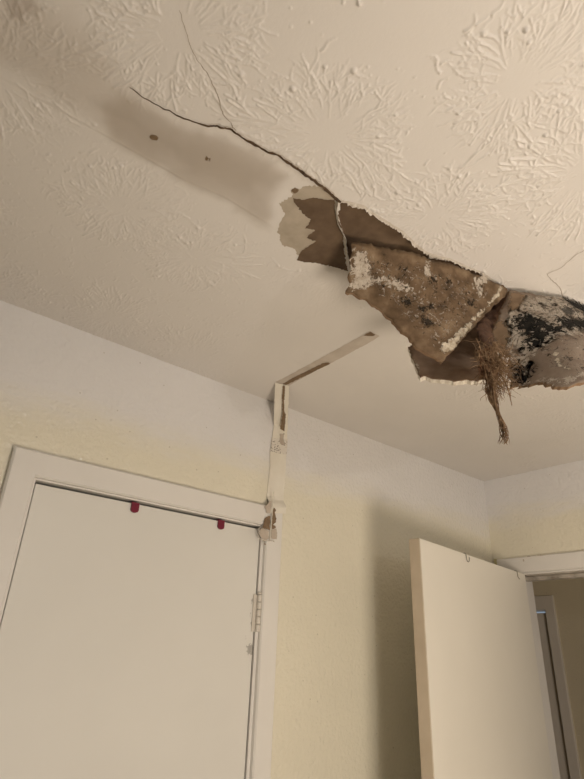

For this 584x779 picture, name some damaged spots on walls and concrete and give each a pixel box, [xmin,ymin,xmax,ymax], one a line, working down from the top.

crack [131,10,342,203]
peeling [258,331,379,545]
damp [506,297,584,387]